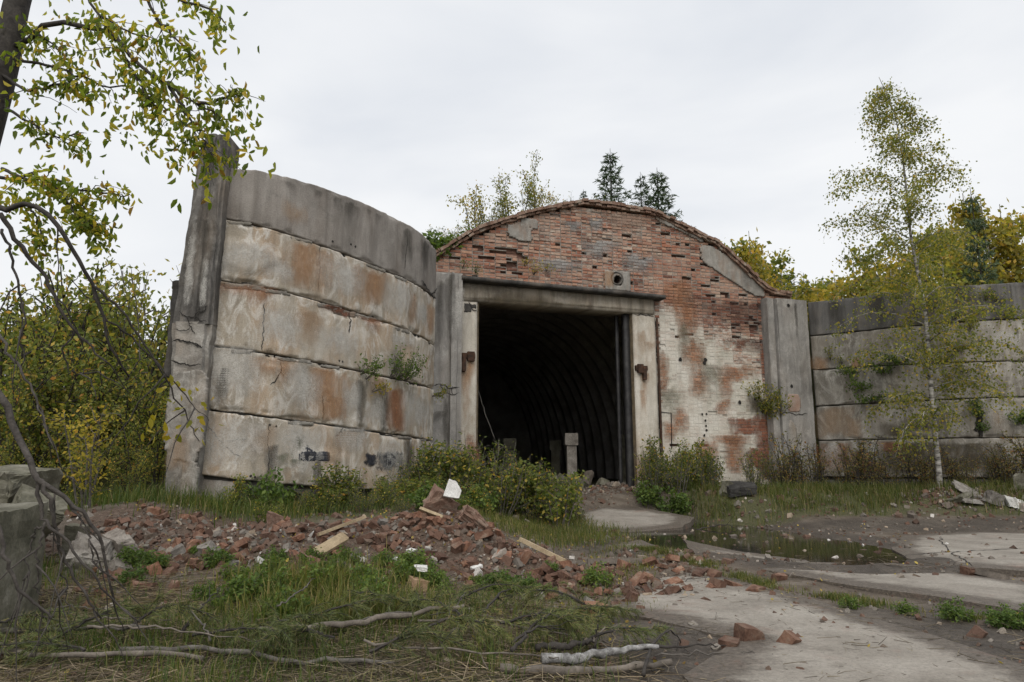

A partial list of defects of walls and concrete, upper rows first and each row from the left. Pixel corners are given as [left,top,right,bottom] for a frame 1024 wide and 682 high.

crack [171,306,206,367]
crack [261,240,437,385]
peeling [666,282,705,393]
peeling [655,216,765,372]
peeling [700,366,769,479]